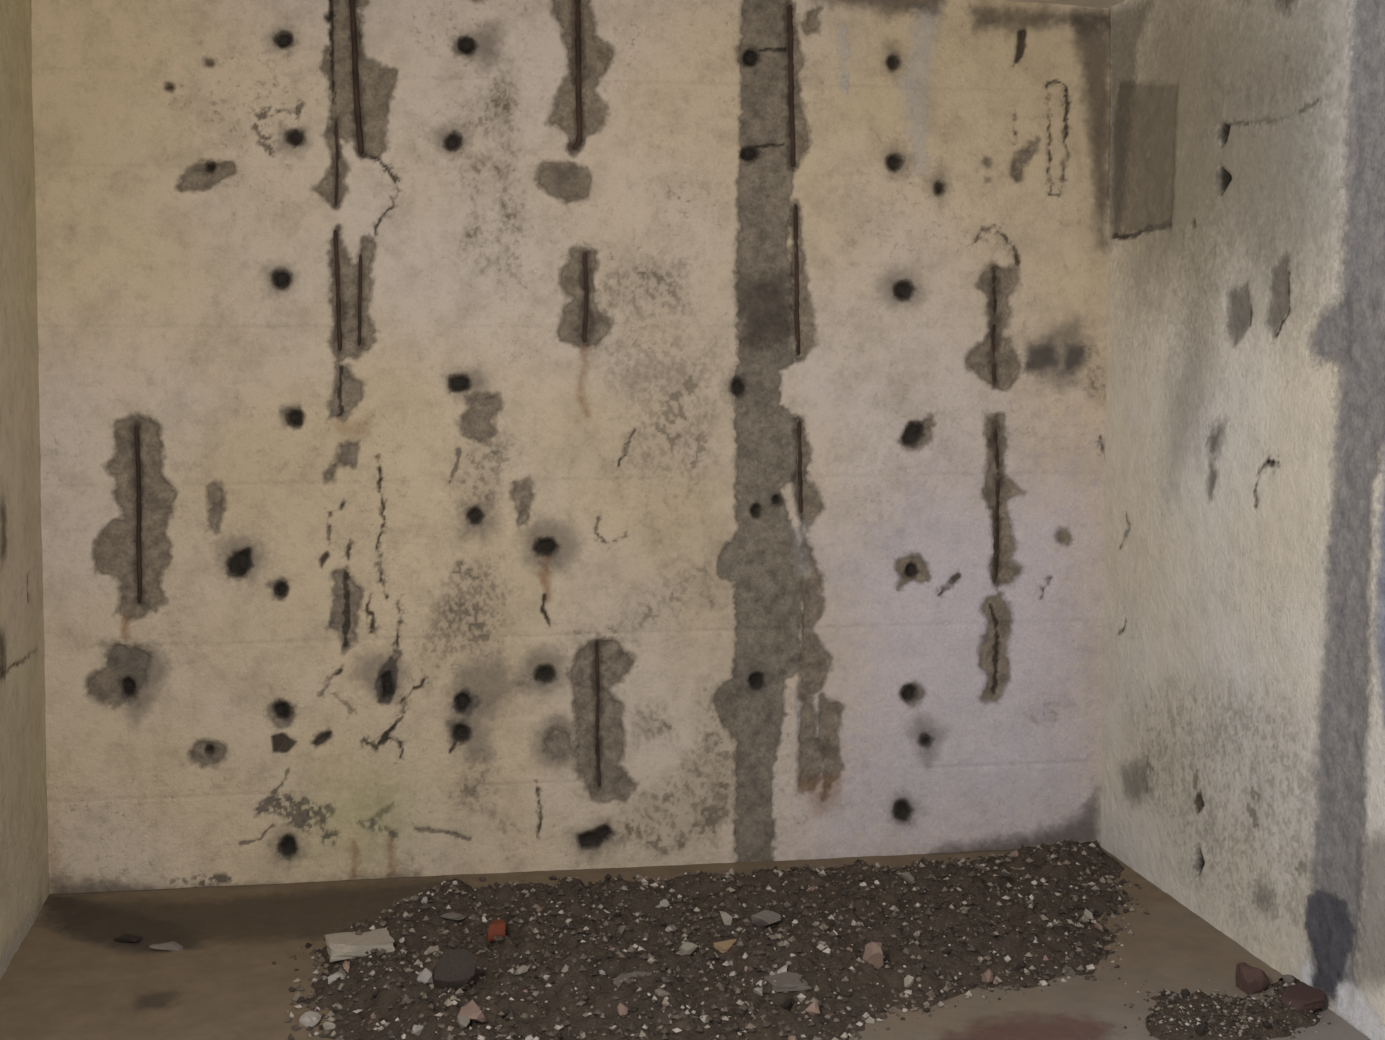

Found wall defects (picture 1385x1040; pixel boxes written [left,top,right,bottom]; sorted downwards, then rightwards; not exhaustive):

spalling [314,0,397,208]
spalling [535,0,613,203]
spalling [787,5,822,167]
spalling [329,225,376,421]
spalling [558,247,612,348]
spalling [966,265,1020,390]
spalling [87,644,151,707]
spalling [93,415,177,620]
crack [364,467,425,758]
spalling [544,640,636,802]
spalling [795,420,843,801]
spalling [979,413,1025,701]